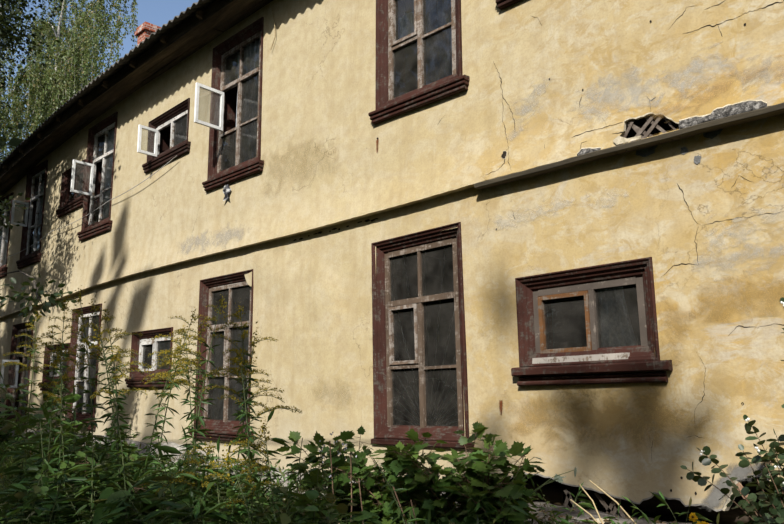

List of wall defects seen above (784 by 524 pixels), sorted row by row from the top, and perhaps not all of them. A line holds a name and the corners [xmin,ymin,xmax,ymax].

crack [668,1,782,36]
crack [486,64,515,175]
spalling [577,147,601,156]
spalling [613,100,767,164]
crack [664,184,779,275]
spalling [524,462,765,518]